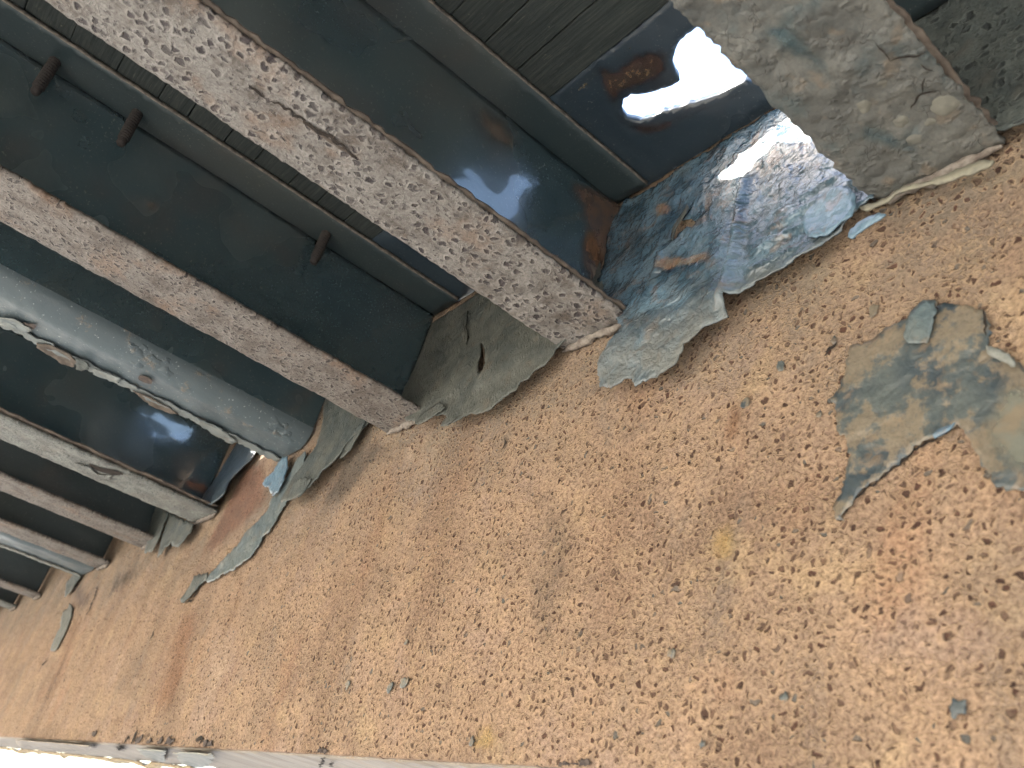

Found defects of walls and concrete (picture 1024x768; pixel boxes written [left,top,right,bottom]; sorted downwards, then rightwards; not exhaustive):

crack [248,84,358,160]
corrosion [201,0,627,310]
corrosion [602,47,663,96]
peeling [592,109,995,389]
peeling [0,317,32,333]
peeling [36,343,121,383]
peeling [402,293,566,427]
peeling [830,299,1024,521]
peeling [180,398,369,603]